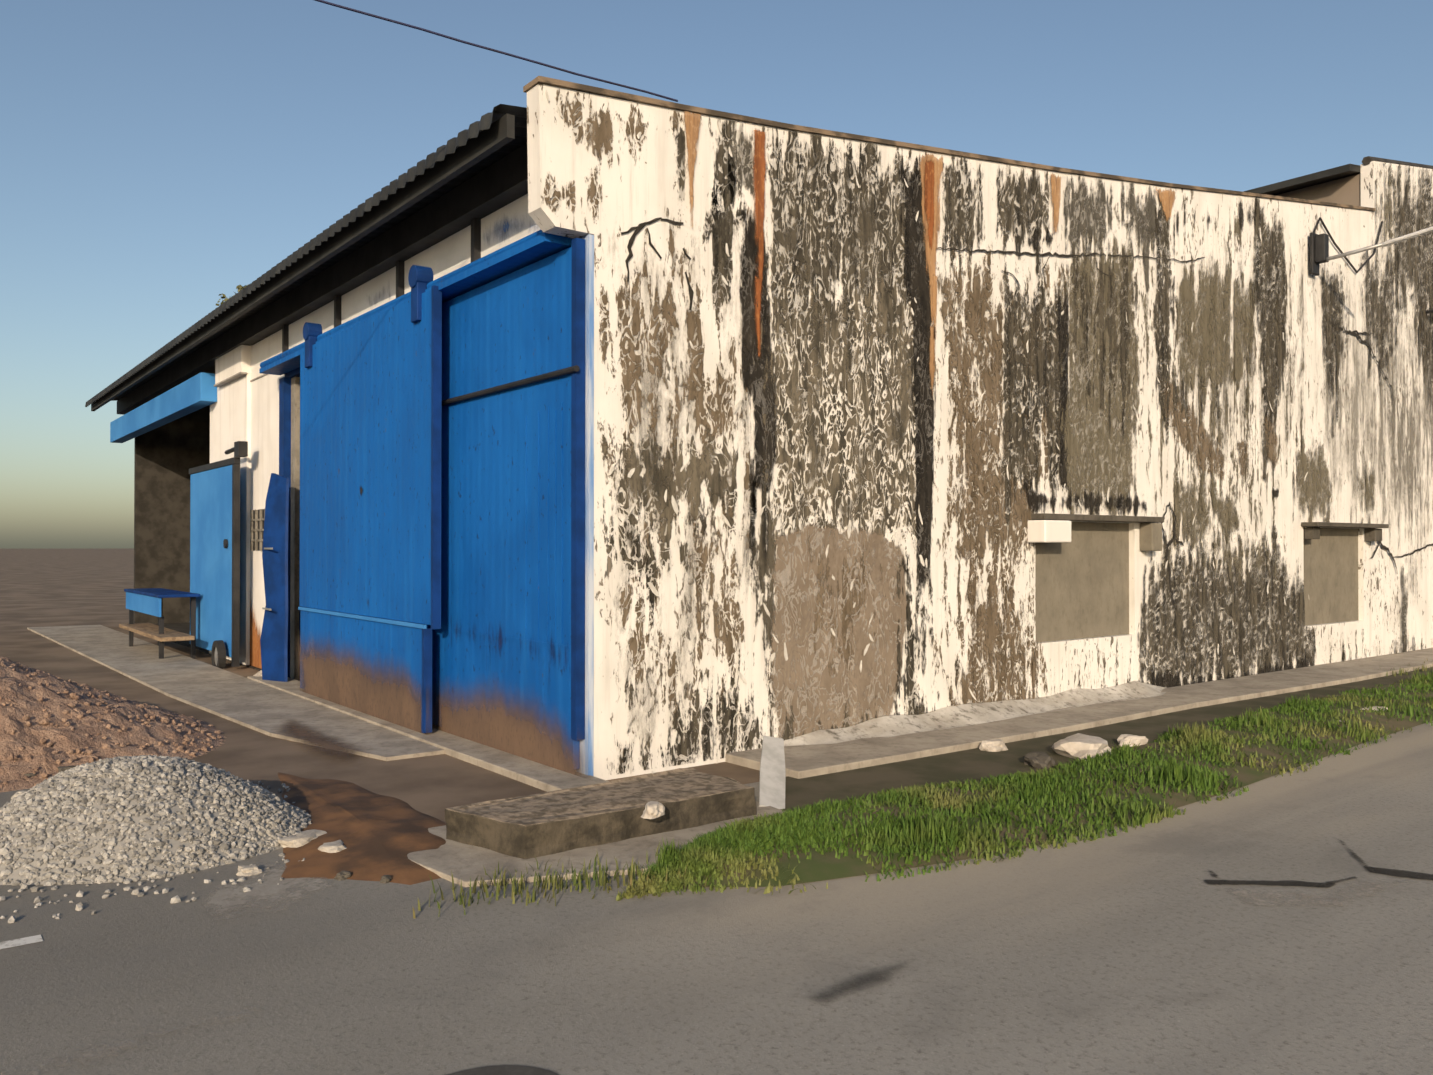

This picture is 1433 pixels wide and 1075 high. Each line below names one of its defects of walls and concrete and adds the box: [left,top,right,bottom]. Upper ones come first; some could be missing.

peeling [541,89,649,218]
crack [621,217,694,310]
rust [684,111,701,227]
rust [753,129,766,356]
peeling [595,190,1070,775]
water stain [708,120,968,740]
rust [920,154,943,390]
water stain [1001,200,1212,534]
peeling [1114,195,1337,566]
water stain [1321,164,1433,533]
rust [299,648,580,777]
mould [1131,517,1316,688]